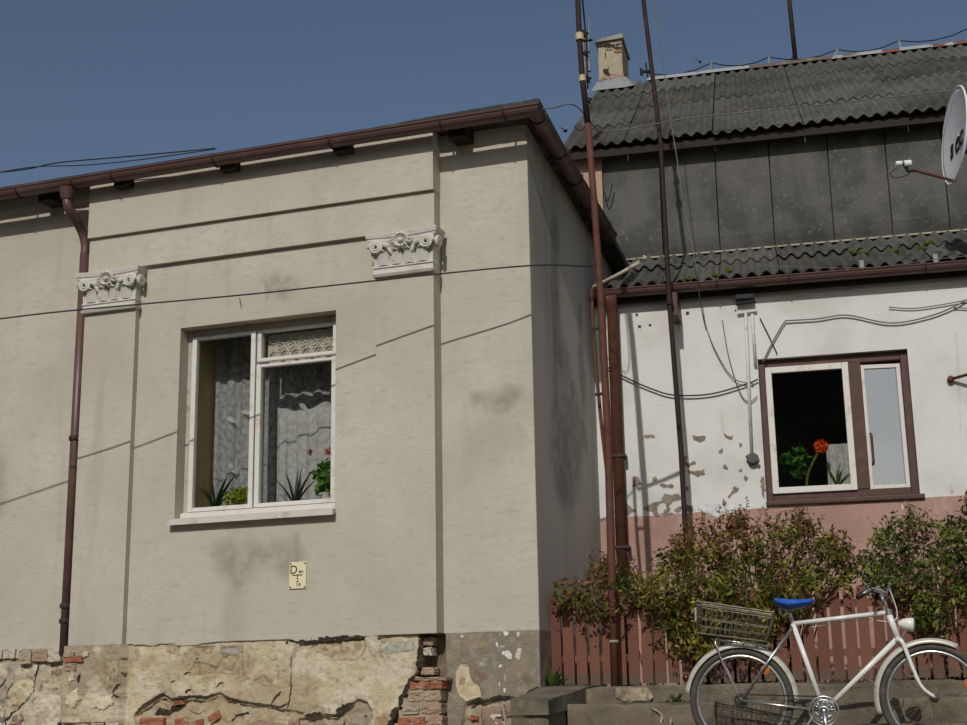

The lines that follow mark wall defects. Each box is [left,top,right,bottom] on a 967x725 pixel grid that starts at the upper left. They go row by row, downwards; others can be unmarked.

peeling [684,456,705,477]
peeling [626,476,693,517]
peeling [314,639,366,661]
peeling [496,631,525,671]
spalling [0,646,372,725]
flaking render [395,637,512,725]